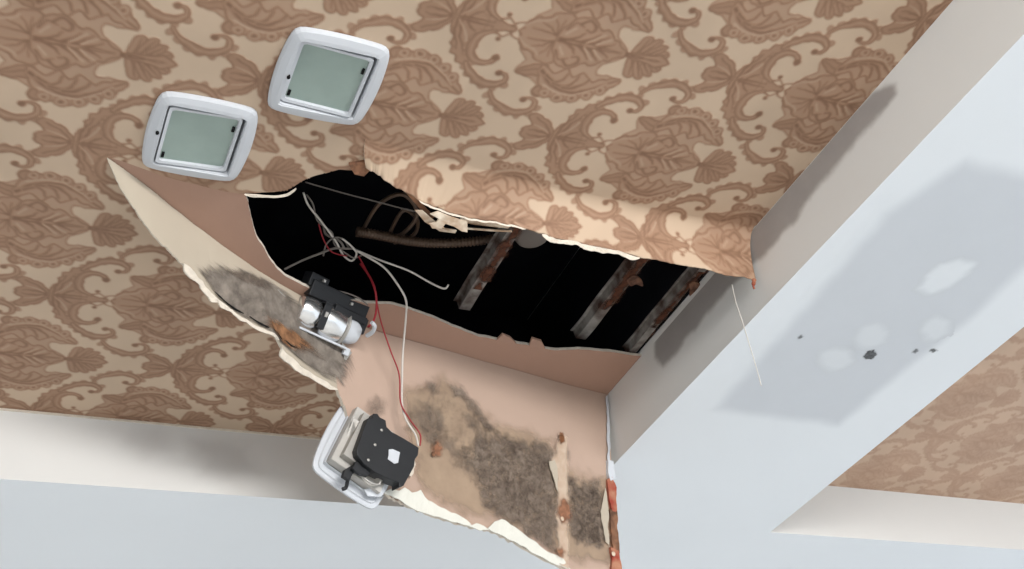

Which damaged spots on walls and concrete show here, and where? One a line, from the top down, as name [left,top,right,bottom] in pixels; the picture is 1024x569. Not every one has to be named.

peeling [349,160,369,176]
peeling [107,158,338,391]
water stain [201,265,350,384]
corrosion [473,227,522,290]
peeling [496,333,516,344]
peeling [529,337,545,349]
corrosion [602,258,650,310]
corrosion [643,268,707,340]
water stain [405,380,611,568]
peeling [384,463,570,569]
corrosion [606,460,622,569]